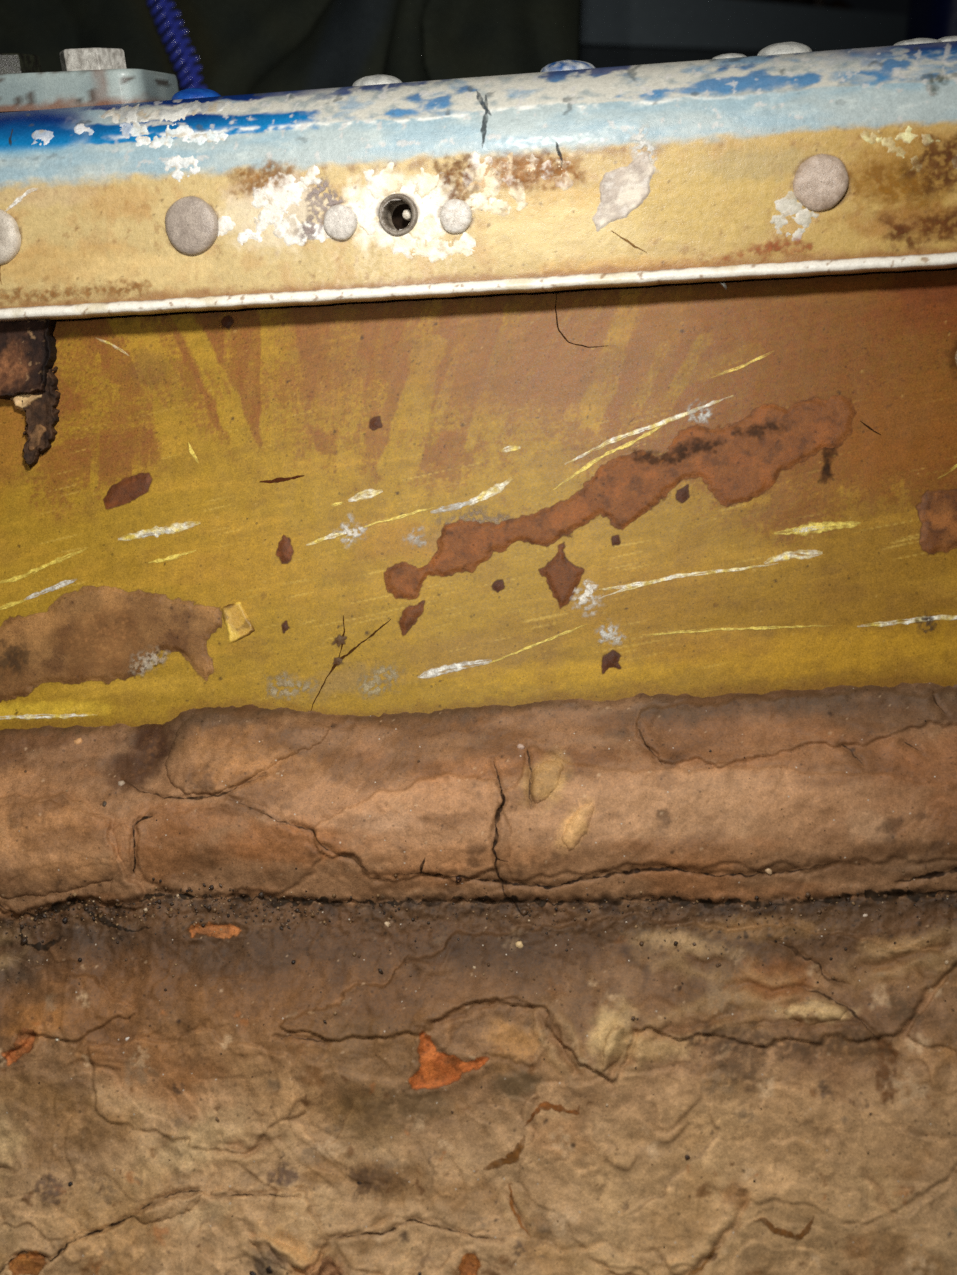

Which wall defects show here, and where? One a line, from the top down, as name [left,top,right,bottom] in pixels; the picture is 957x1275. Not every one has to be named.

peeling [31,130,54,145]
peeling [74,124,94,136]
peeling [101,100,240,182]
corrosion [240,161,292,191]
corrosion [435,158,472,199]
corrosion [501,153,581,188]
corrosion [867,142,957,247]
peeling [0,586,255,702]
crack [311,615,391,710]
crack [0,750,957,950]
damp [687,1024,899,1102]
crack [0,1190,288,1272]